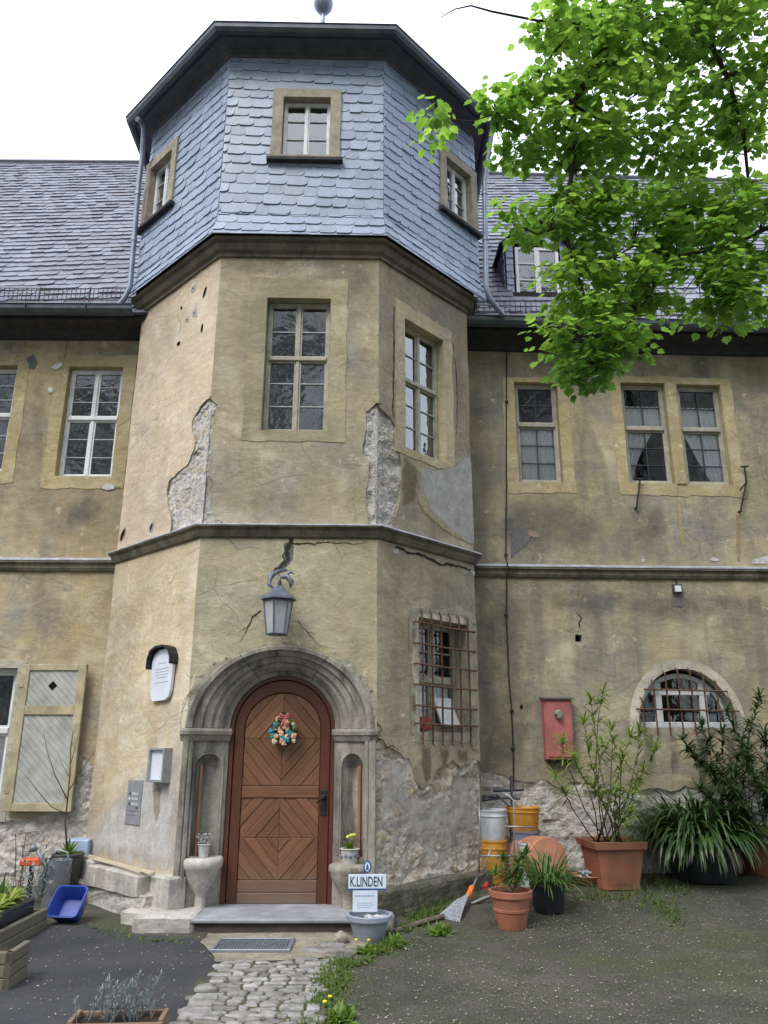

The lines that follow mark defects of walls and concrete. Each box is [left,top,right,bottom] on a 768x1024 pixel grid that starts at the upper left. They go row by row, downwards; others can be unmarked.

flaking render [168,400,222,531]
flaking render [363,404,400,527]
crack [273,539,367,572]
crack [393,546,475,575]
flaking render [0,757,93,886]
flaking render [262,642,768,885]